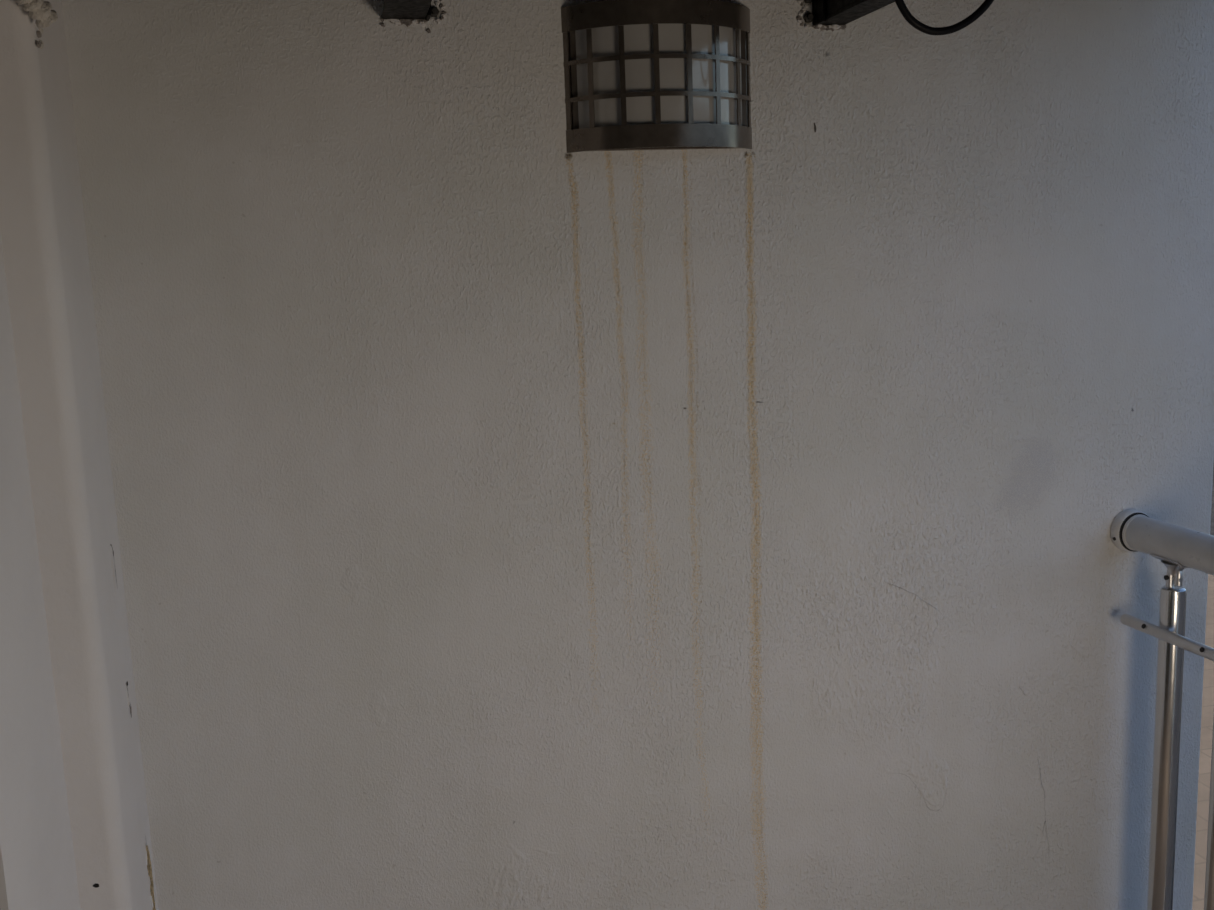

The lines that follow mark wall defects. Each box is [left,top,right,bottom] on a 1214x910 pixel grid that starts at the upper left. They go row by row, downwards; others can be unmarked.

corrosion [743,151,769,909]